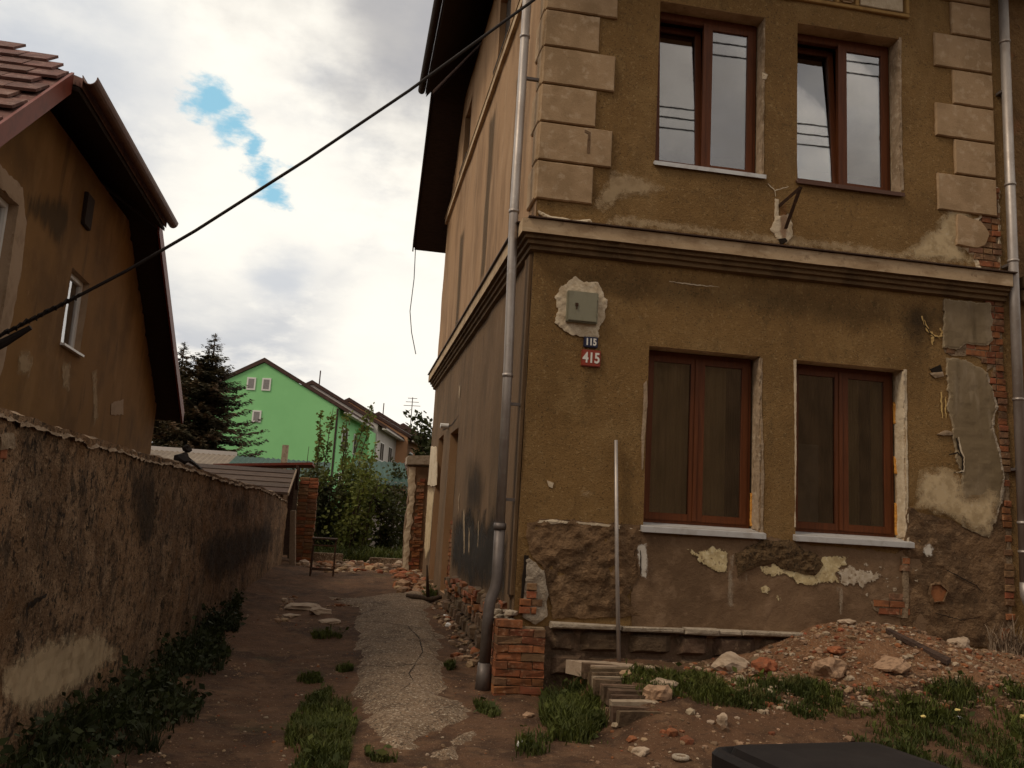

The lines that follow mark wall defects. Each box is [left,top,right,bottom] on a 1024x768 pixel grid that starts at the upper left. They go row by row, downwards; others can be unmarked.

peeling [906,187,1002,270]
flaking render [493,299,1015,647]
water stain [452,474,506,594]